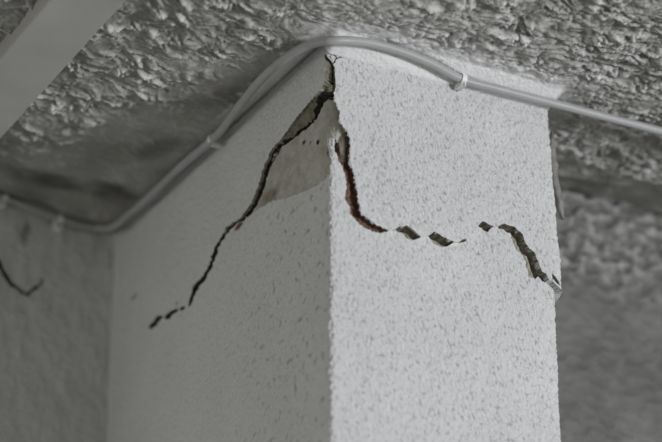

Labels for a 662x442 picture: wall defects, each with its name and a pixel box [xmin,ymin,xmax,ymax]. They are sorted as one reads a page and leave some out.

crack [149,54,342,329]
flaking render [243,80,349,218]
crack [327,131,466,247]
crack [0,261,44,297]
crack [479,221,548,282]